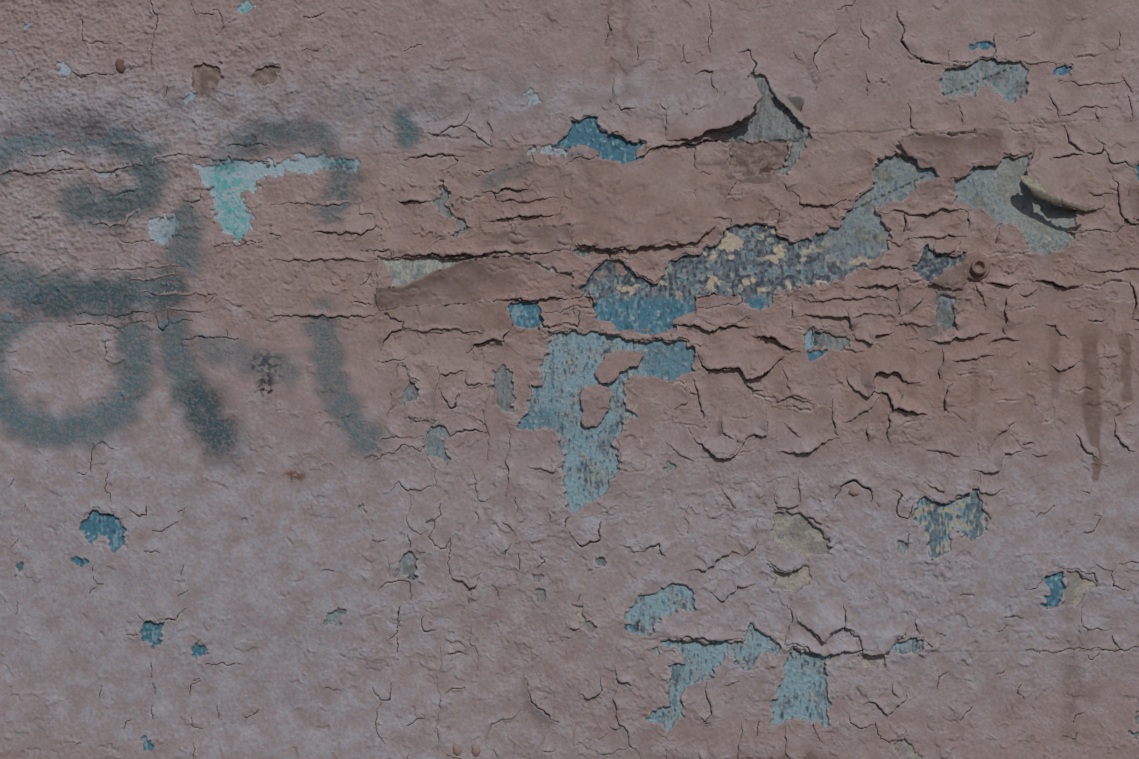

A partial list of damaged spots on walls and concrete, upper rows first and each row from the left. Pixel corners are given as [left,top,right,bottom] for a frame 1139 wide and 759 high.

crack [0,139,269,356]
peeling [193,153,360,245]
crack [214,79,699,759]
peeling [527,111,647,164]
crack [610,7,851,225]
peeling [666,73,811,178]
peeling [376,126,1106,514]
peeling [624,484,924,731]
crack [784,604,863,657]
crack [666,261,1139,544]
peeling [912,486,990,558]
crack [793,1,1139,233]